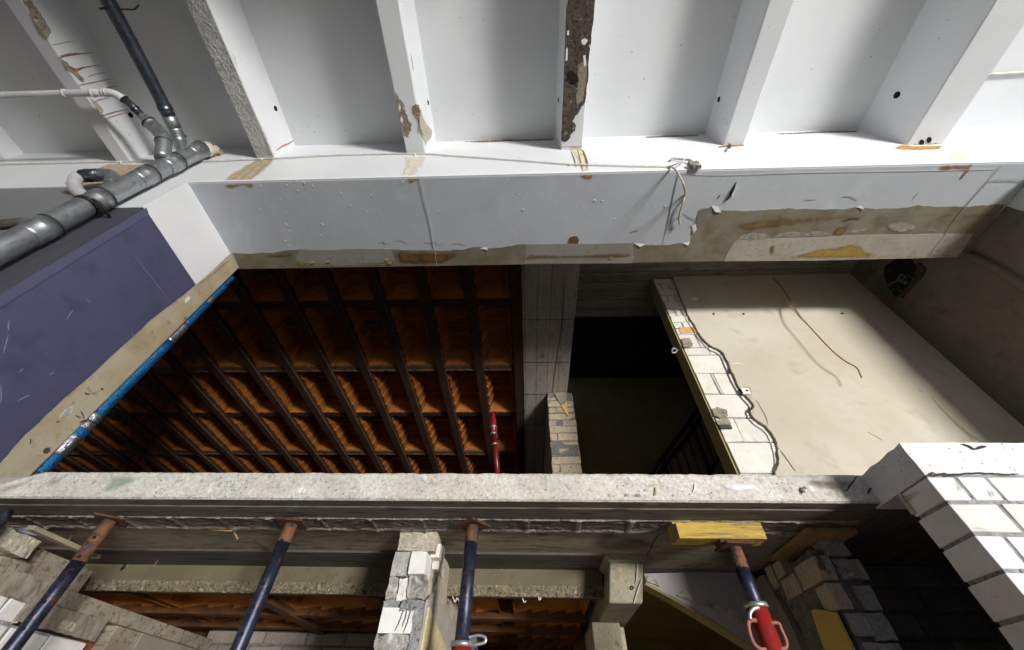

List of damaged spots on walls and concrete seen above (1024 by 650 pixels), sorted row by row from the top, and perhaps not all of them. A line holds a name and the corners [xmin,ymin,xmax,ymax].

spalling [22,0,51,38]
peeling [561,0,595,142]
peeling [395,92,432,146]
corrosion [940,152,971,179]
peeling [233,204,1004,299]